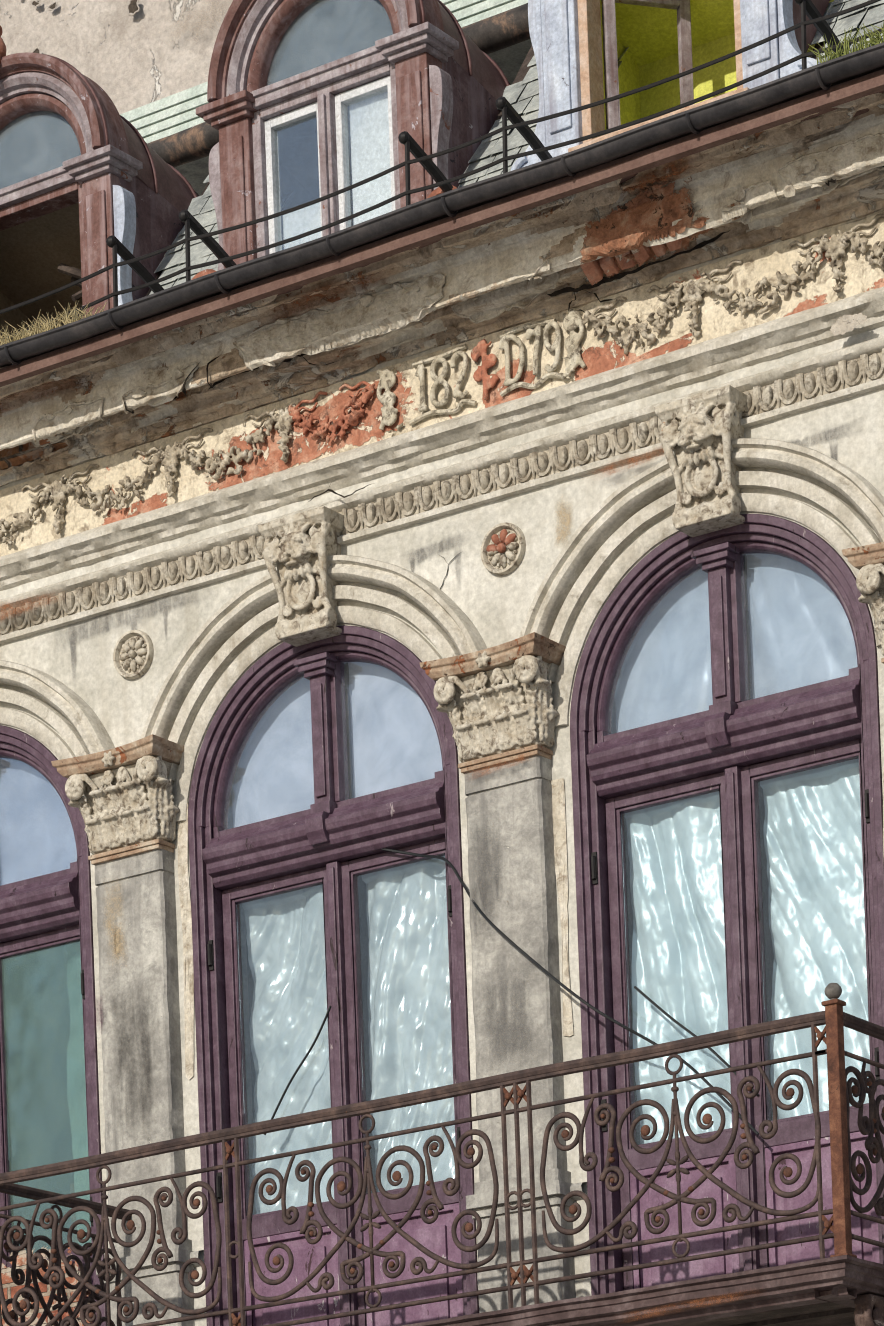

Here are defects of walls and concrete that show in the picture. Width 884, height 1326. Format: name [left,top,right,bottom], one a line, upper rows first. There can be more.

spalling [580,133,884,285]
crack [547,230,730,313]
peeling [122,362,198,414]
flaking render [482,358,535,408]
peeling [0,397,104,476]
flaking render [197,372,418,493]
flaking render [102,492,168,526]